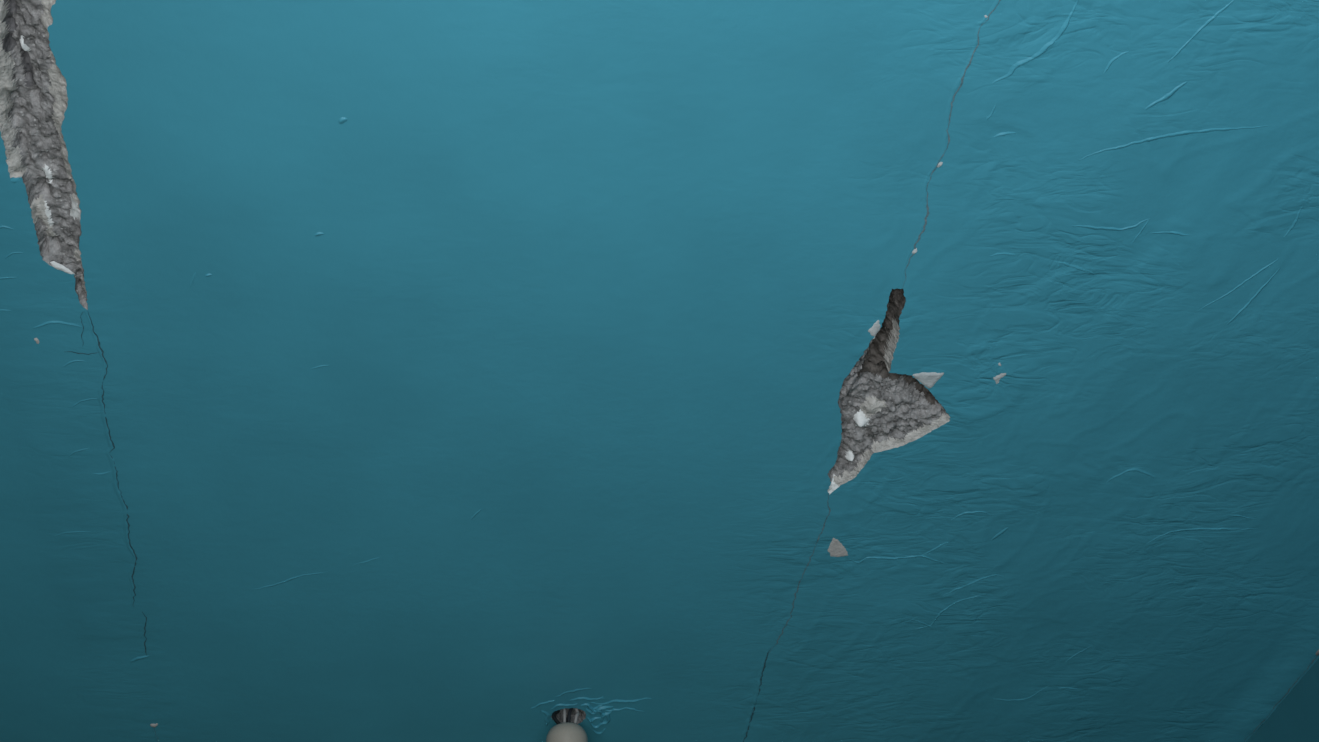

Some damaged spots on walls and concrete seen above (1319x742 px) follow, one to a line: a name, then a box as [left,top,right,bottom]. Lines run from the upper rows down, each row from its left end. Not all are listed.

spalling [0,0,88,310]
crack [67,311,147,655]
peeling [827,538,848,557]
spalling [828,288,950,495]